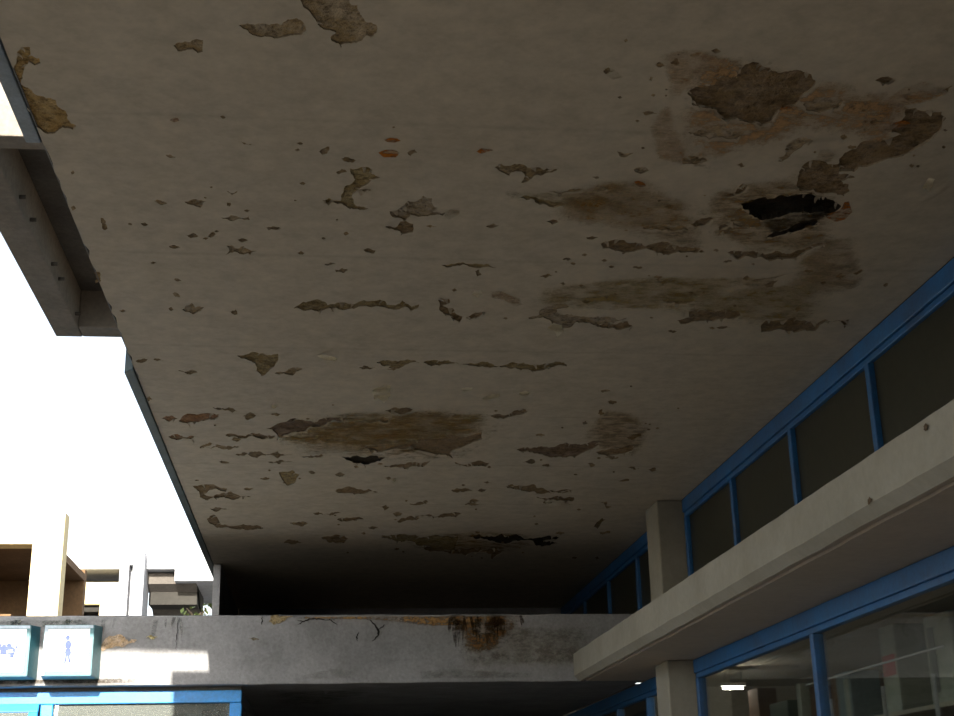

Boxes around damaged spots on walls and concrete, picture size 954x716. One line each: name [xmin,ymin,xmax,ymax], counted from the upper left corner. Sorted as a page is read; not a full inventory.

peeling [241,0,377,48]
peeling [14,47,74,134]
peeling [688,62,815,125]
peeling [779,89,946,214]
water stain [550,183,854,321]
peeling [296,299,419,315]
peeling [163,407,348,485]
water stain [284,413,480,455]
peeling [360,433,491,482]
peeling [194,479,263,530]
spalling [101,634,155,651]
crack [356,619,384,641]